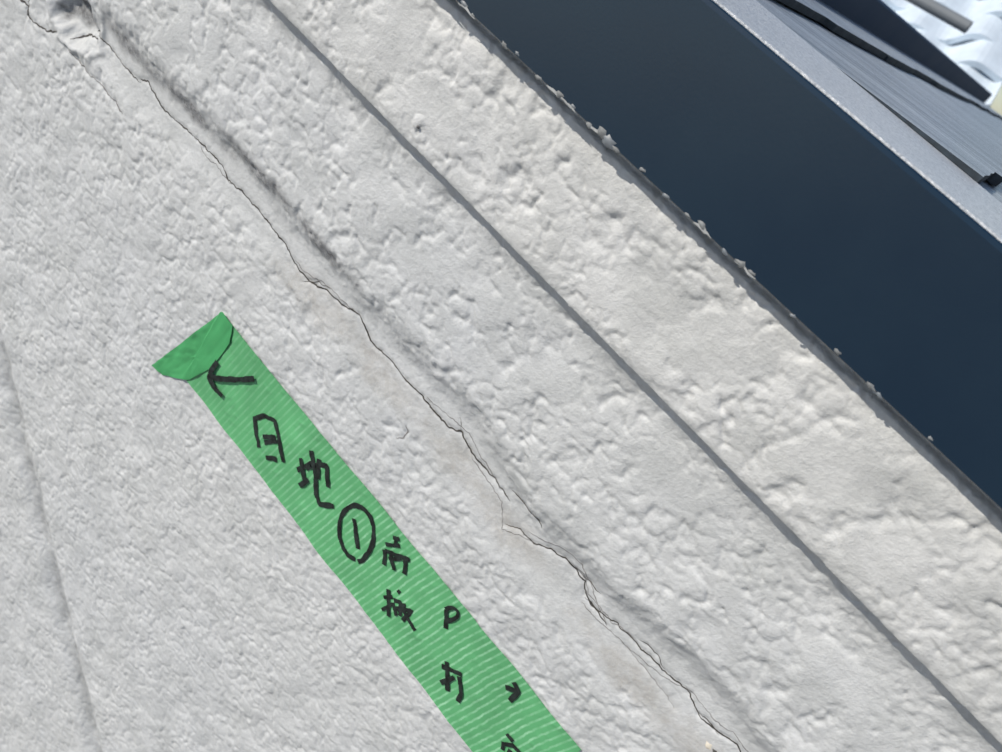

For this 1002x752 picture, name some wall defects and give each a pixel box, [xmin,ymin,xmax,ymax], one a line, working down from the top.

crack [20,0,748,752]